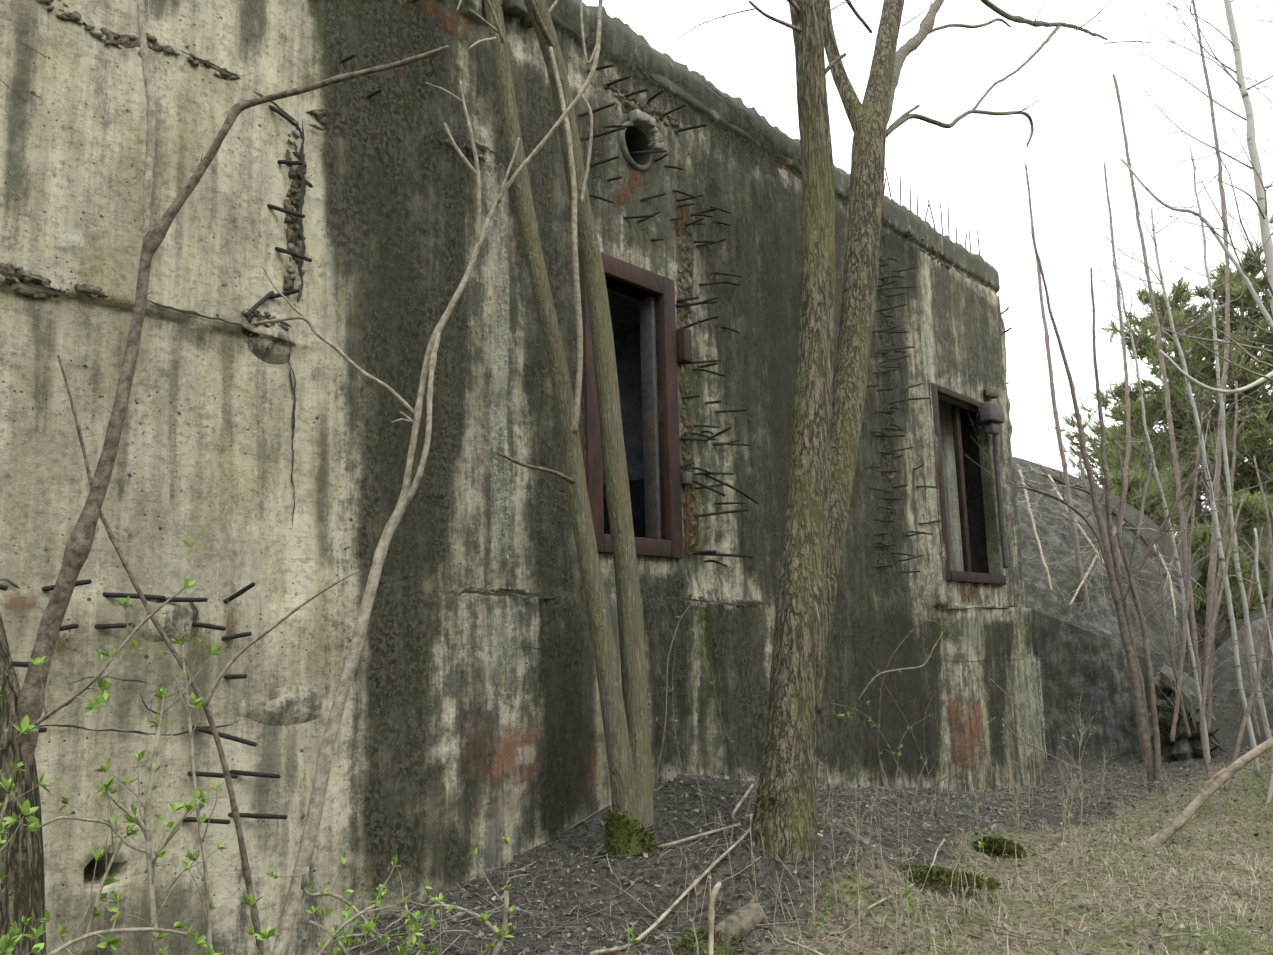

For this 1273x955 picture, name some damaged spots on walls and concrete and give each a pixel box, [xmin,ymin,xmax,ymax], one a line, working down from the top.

spalling [38,0,241,80]
spalling [0,263,109,300]
crack [147,300,260,337]
crack [288,352,296,524]
spalling [241,105,345,331]
water stain [302,0,597,890]
water stain [549,0,802,772]
water stain [816,188,1047,779]